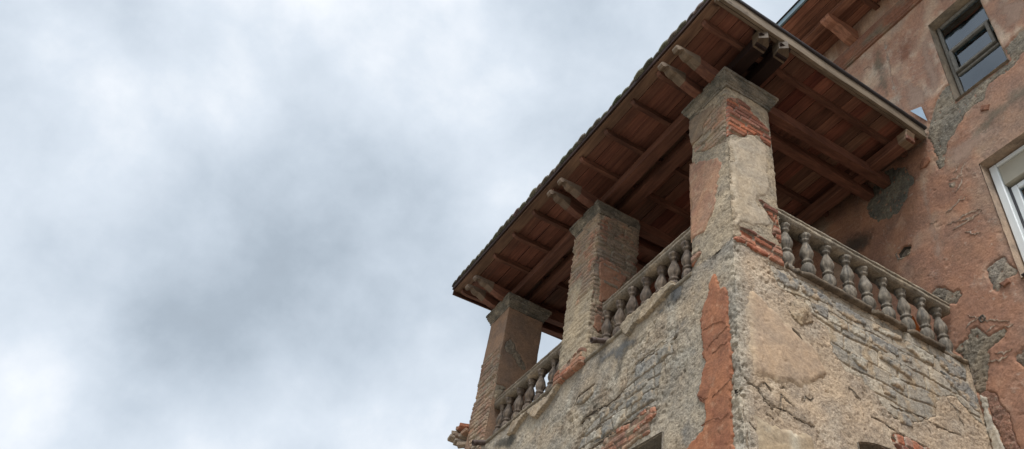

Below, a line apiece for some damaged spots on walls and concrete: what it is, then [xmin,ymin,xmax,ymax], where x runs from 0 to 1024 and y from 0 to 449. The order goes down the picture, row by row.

spalling [693,89,771,153]
spalling [867,30,1024,235]
spalling [578,335,675,449]
peeling [687,274,738,449]
spalling [731,199,1024,449]